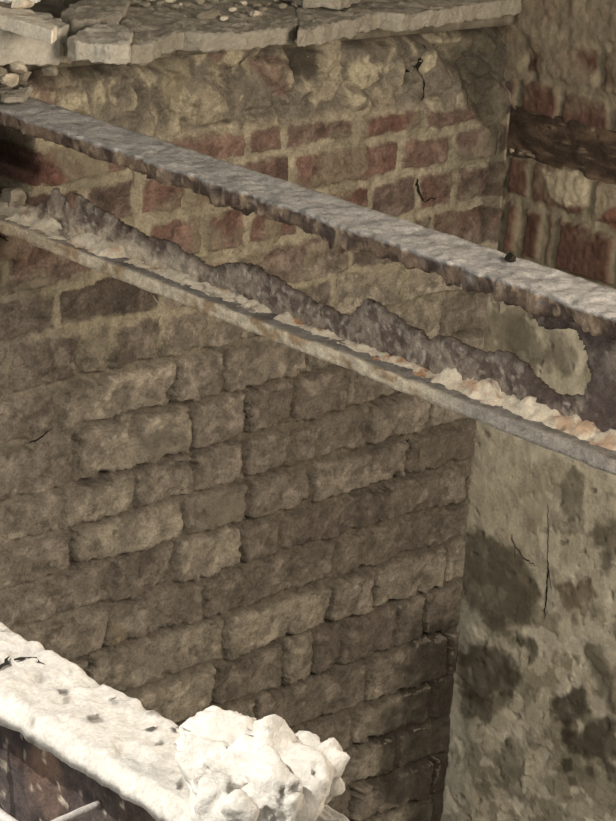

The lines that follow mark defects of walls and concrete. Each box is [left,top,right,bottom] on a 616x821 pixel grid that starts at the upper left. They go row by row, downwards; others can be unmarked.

crack [405,44,426,101]
spalling [602,208,616,229]
water stain [462,530,539,633]
crack [511,504,552,618]
water stain [517,637,538,663]
water stain [551,688,616,785]